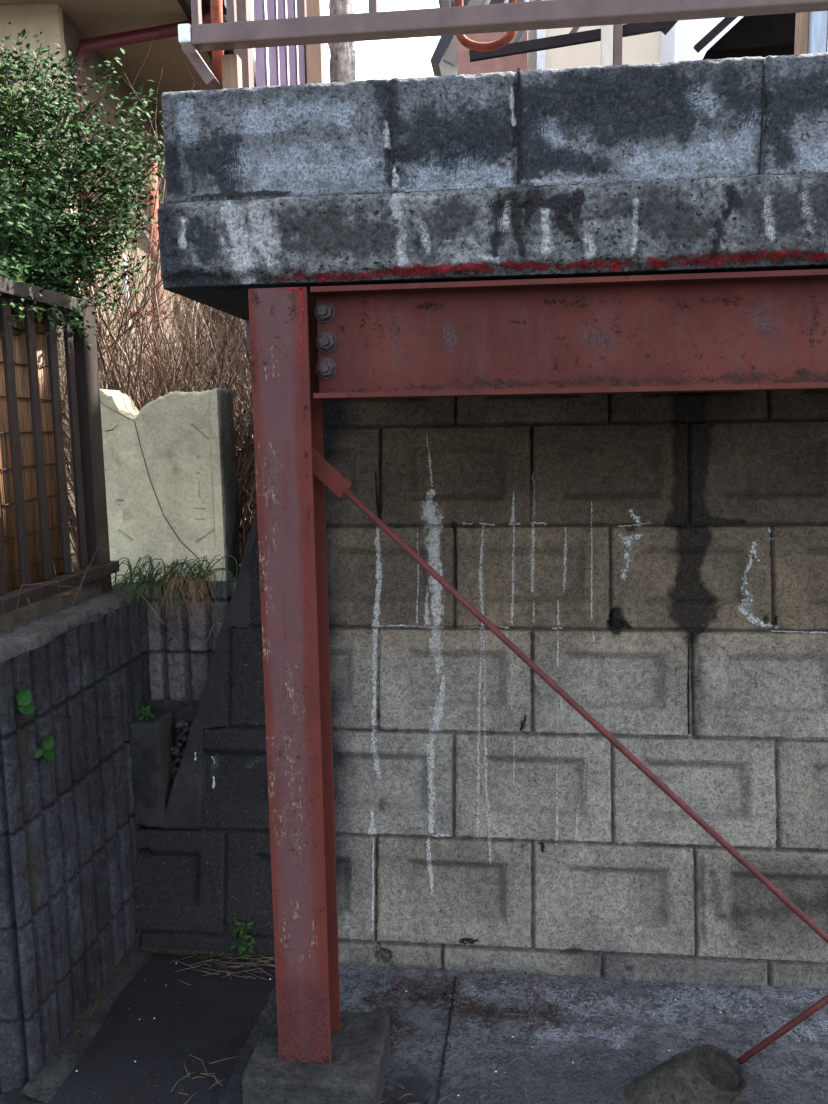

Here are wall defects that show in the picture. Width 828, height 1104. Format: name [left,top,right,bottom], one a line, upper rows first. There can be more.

water stain [221,200,280,284]
water stain [390,194,408,268]
water stain [419,222,430,253]
water stain [481,186,596,263]
water stain [710,185,744,258]
water stain [764,196,775,241]
water stain [665,392,747,641]
efflorescence [500,472,546,710]
efflorescence [552,526,568,668]
efflorescence [370,430,451,895]
efflorescence [463,522,495,865]
efflorescence [368,808,377,932]